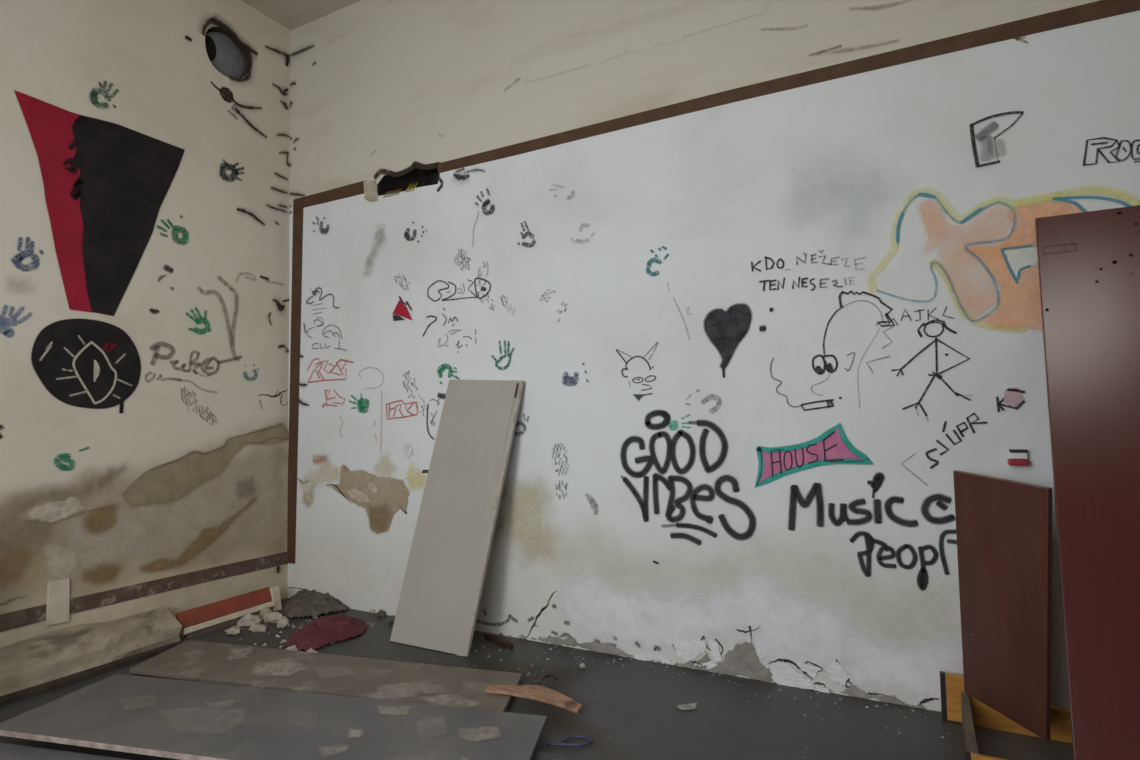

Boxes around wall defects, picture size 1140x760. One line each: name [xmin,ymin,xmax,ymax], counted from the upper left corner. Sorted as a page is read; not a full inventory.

spalling [377,162,440,196]
peeling [28,497,85,522]
leakage [0,424,289,587]
peeling [329,464,410,534]
spalling [476,610,925,709]